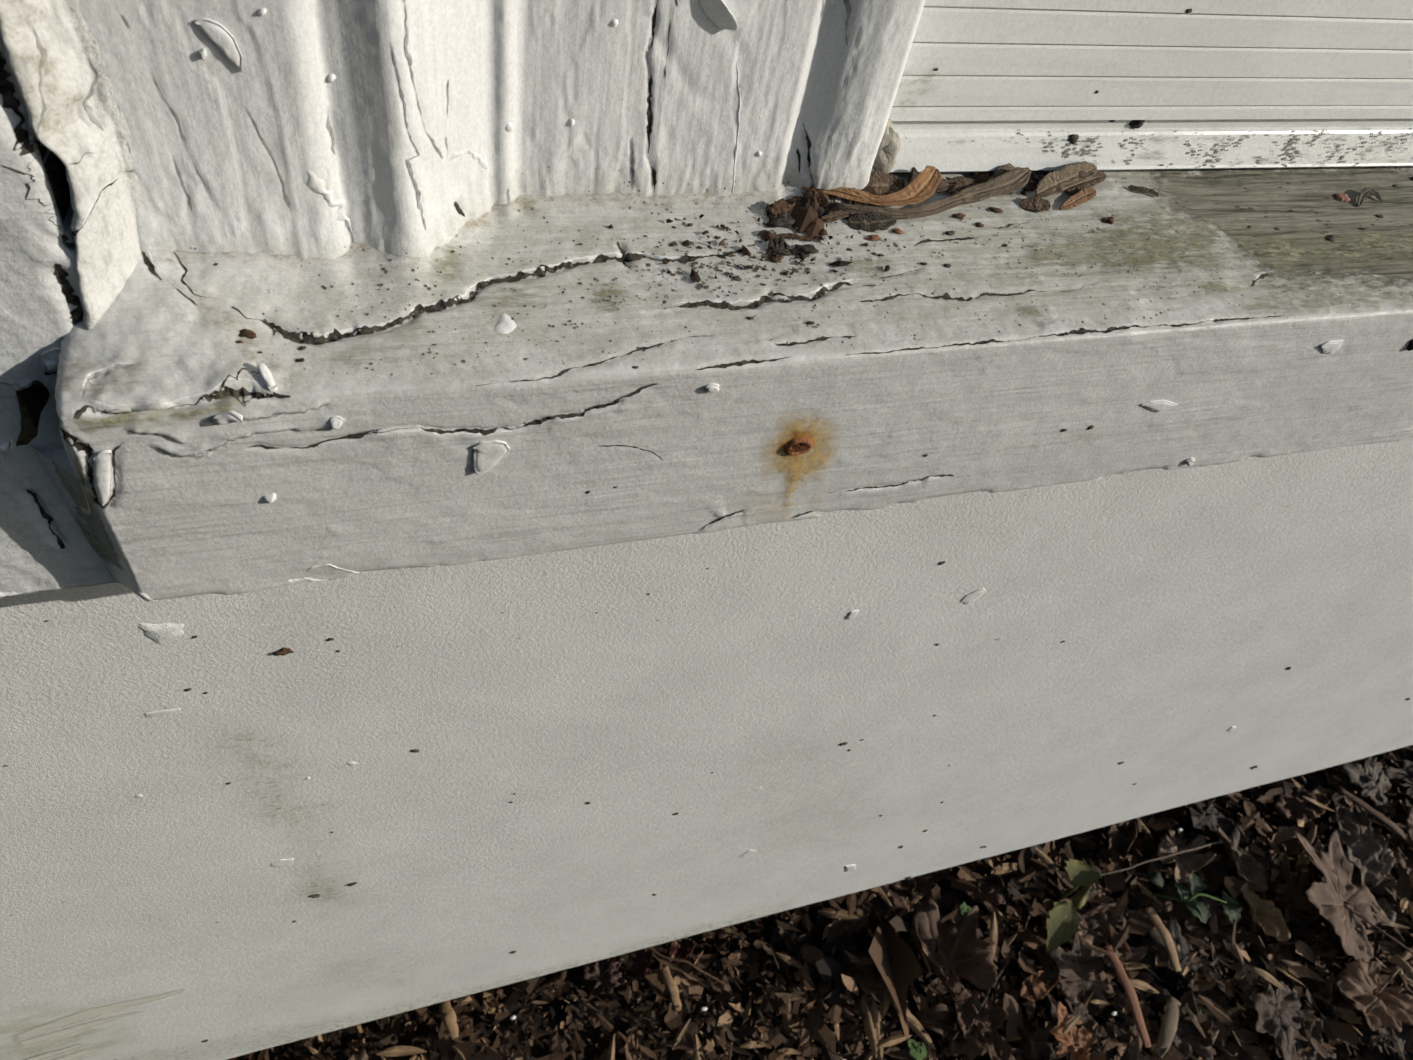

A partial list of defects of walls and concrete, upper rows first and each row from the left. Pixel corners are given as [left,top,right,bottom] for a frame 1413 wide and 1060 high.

crack [0,27,134,325]
crack [149,64,212,212]
crack [245,105,293,214]
crack [327,109,336,155]
crack [630,0,678,195]
crack [796,124,832,186]
peeling [1151,166,1413,295]
crack [141,242,742,345]
crack [477,222,1355,386]
spalling [12,380,48,427]
crack [242,383,664,462]
rust [770,420,831,505]